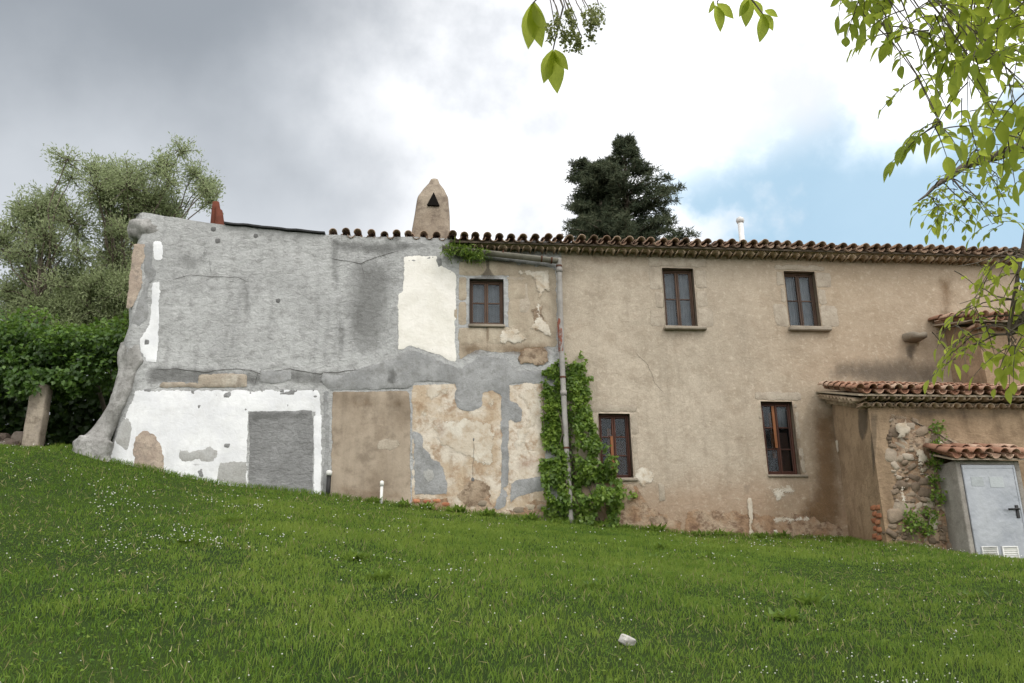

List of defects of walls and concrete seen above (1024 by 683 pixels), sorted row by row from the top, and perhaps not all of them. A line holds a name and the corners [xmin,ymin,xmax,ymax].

peeling [499,269,552,366]
peeling [111,389,322,495]
peeling [377,383,552,521]
damp [808,420,834,523]